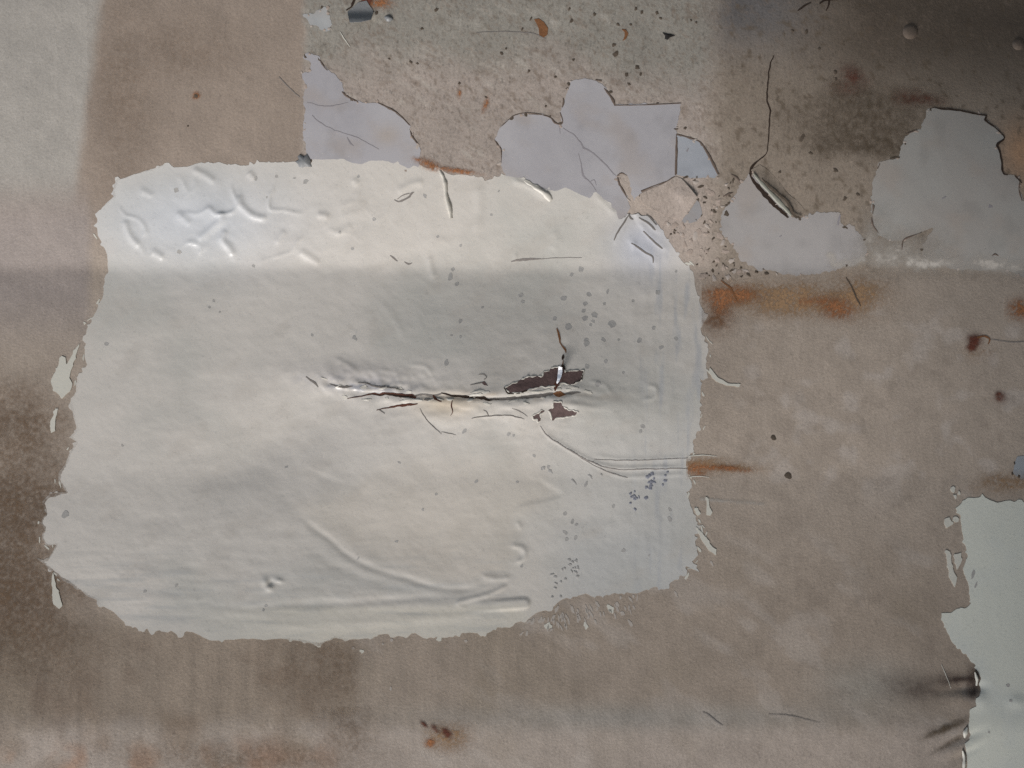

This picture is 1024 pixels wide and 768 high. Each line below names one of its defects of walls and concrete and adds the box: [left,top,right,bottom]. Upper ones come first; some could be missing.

peeling [301,53,421,172]
crack [749,56,801,219]
corrosion [415,159,471,174]
peeling [494,78,1024,281]
corrosion [706,280,878,327]
corrosion [967,335,990,351]
crack [306,328,593,435]
corrosion [686,455,749,478]
corrosion [421,722,462,747]